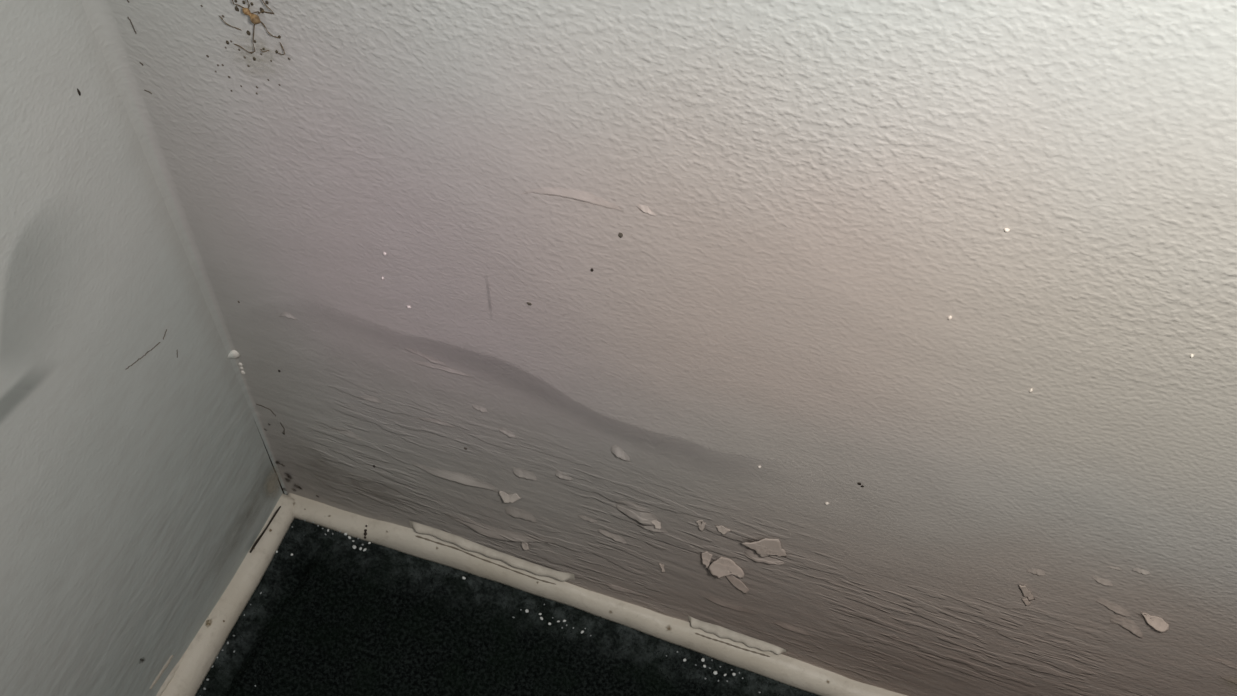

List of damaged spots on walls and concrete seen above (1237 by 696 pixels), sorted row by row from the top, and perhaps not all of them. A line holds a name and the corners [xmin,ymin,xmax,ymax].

peeling [499,491,521,503]
peeling [409,520,575,582]
peeling [742,538,787,558]
peeling [701,552,750,594]
peeling [1140,611,1169,633]